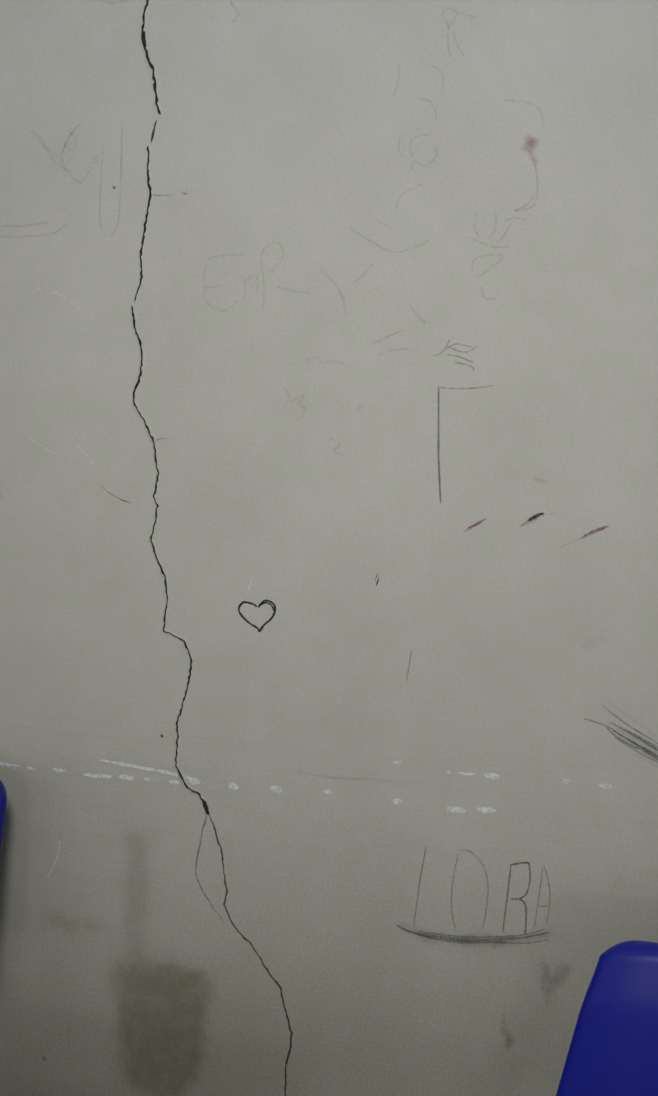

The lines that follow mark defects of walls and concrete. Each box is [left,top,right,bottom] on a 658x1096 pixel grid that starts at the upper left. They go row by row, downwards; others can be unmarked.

crack [129,0,293,1096]